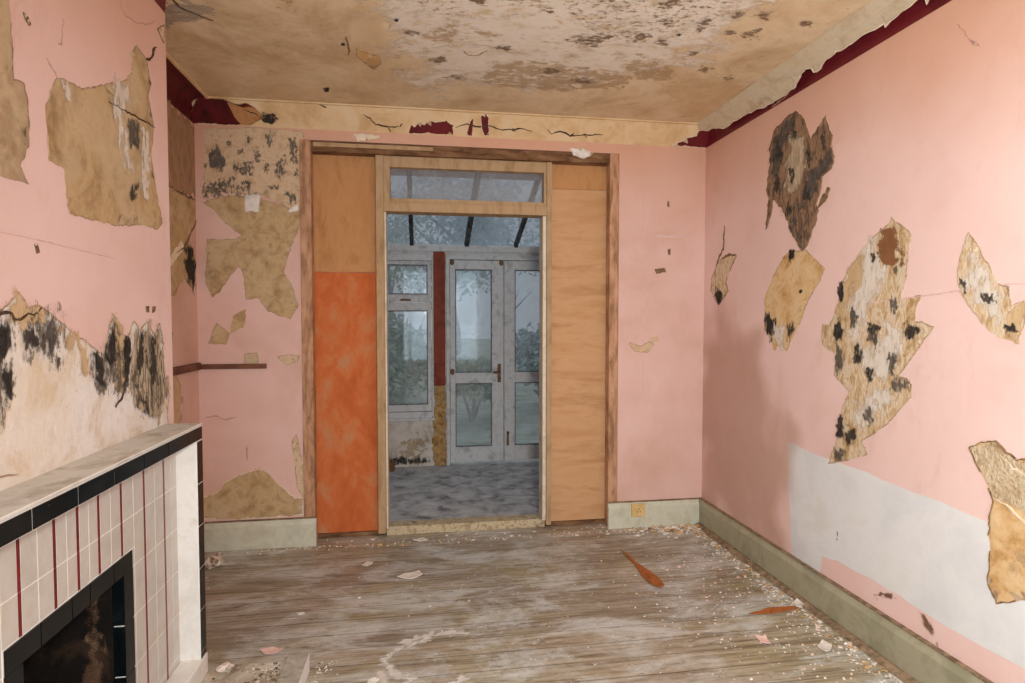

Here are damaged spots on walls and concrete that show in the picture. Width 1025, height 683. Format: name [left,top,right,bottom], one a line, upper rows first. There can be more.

peeling [0,0,30,185]
peeling [45,25,300,345]
crack [363,114,402,132]
crack [455,123,600,138]
peeling [356,0,777,97]
damp [540,67,593,84]
damp [541,0,773,48]
peeling [764,111,835,351]
damp [0,300,68,434]
flaking render [0,291,173,491]
damp [89,313,183,424]
peeling [787,217,1025,669]